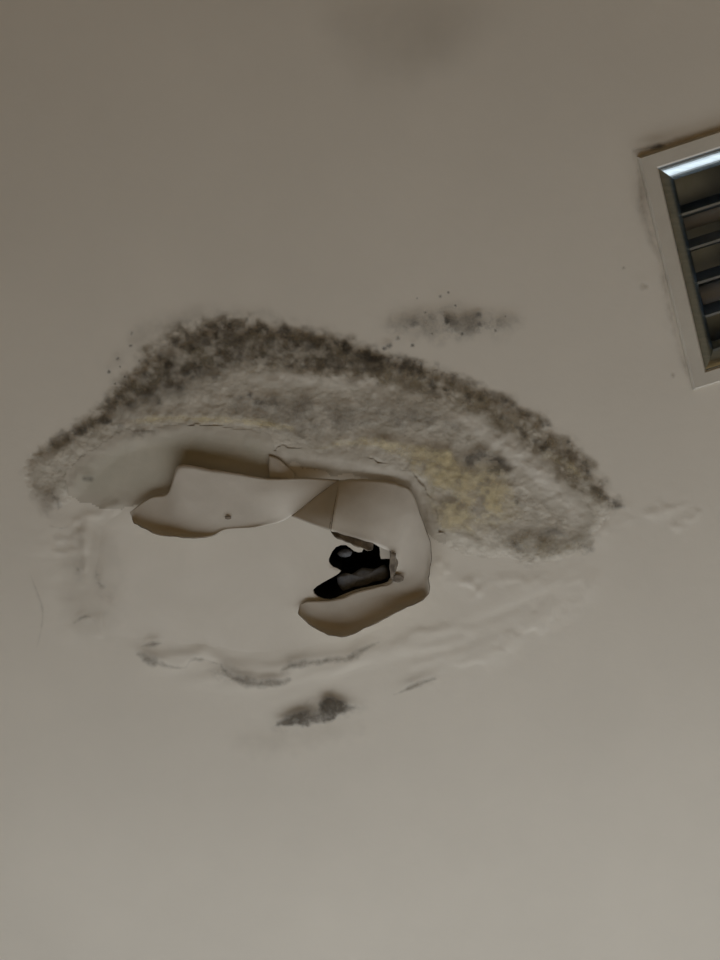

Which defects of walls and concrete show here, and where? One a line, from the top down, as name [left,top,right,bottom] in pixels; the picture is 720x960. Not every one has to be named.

damp [84,318,588,488]
damp [64,417,287,510]
spalling [23,322,614,652]
damp [412,448,509,529]
mould [277,698,350,726]